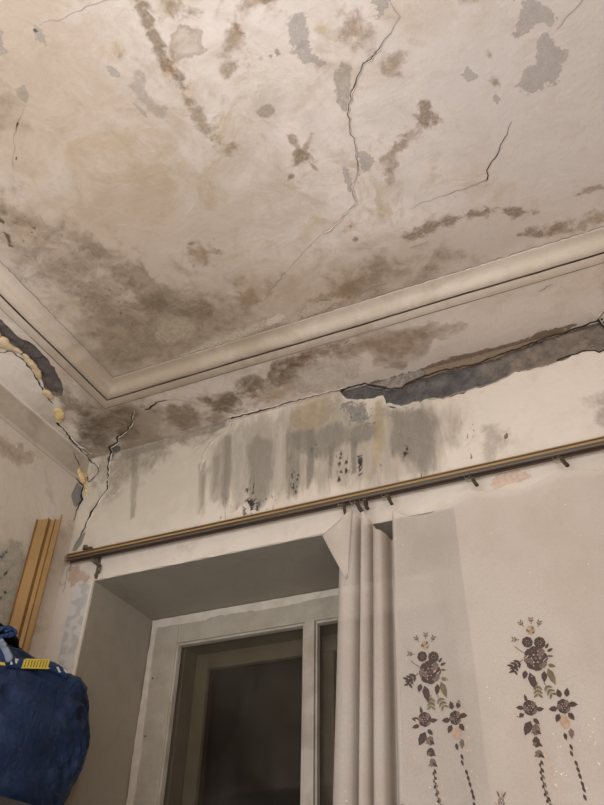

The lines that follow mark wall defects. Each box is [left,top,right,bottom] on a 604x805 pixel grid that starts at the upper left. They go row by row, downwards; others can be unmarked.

peeling [288,13,325,67]
peeling [513,0,568,93]
crack [264,2,400,300]
crack [414,123,511,208]
crack [0,226,604,378]
spalling [0,319,63,397]
crack [0,333,203,591]
damp [222,436,276,515]
crack [181,388,344,471]
damp [204,355,359,414]
damp [287,401,376,494]
spalling [340,318,604,408]